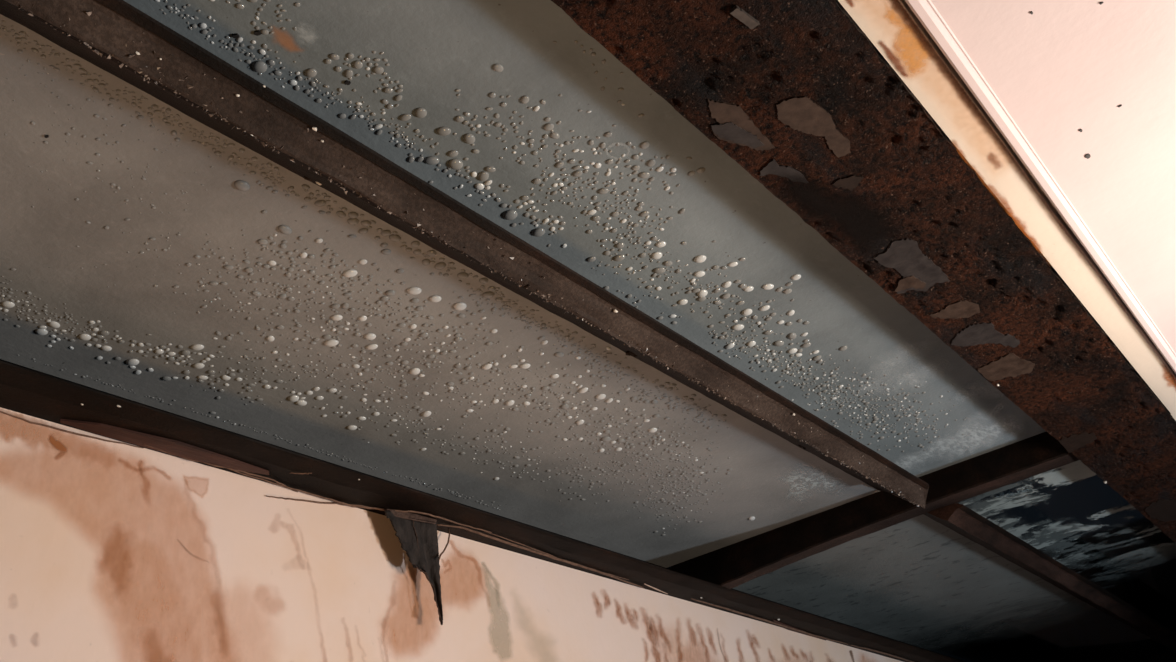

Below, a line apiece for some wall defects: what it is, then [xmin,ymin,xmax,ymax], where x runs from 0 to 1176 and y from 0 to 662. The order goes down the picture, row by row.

corrosion [880,0,1014,167]
peeling [708,99,808,183]
peeling [776,96,851,158]
corrosion [956,149,1040,252]
peeling [873,238,950,294]
peeling [927,300,1035,381]
damp [0,418,67,458]